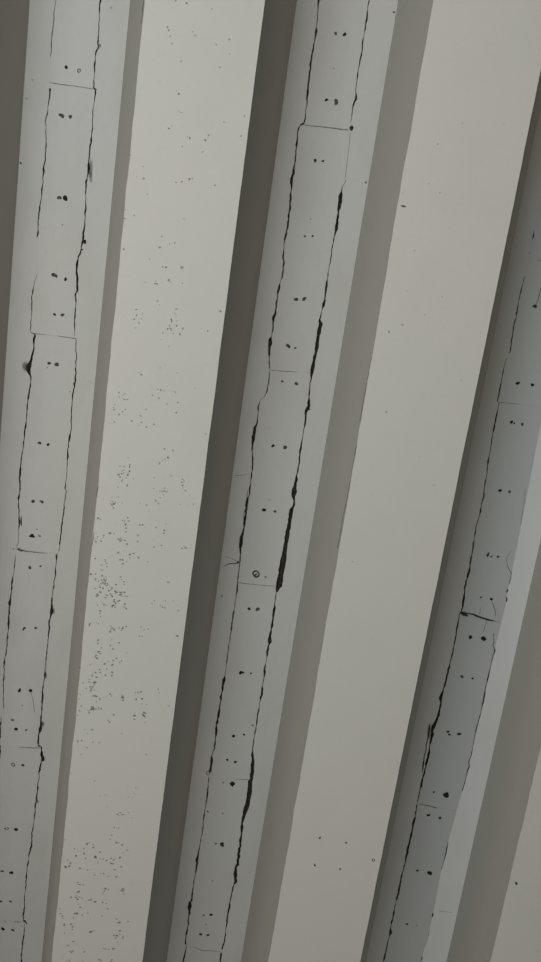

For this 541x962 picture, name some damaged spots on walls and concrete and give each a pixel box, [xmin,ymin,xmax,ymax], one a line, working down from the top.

crack [0,0,101,962]
crack [183,0,370,962]
crack [383,277,525,962]